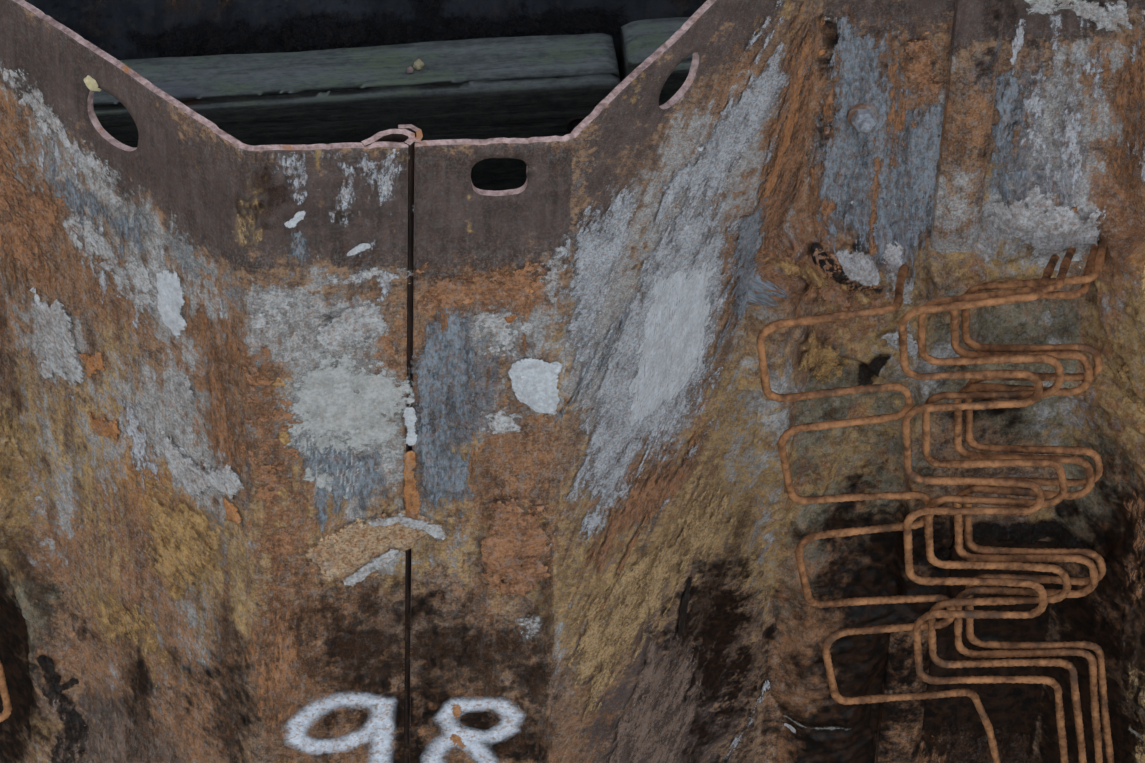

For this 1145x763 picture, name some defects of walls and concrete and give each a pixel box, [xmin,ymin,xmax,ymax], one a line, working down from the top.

rust [0,138,89,302]
rust [747,0,887,315]
rust [868,31,942,268]
spalling [987,71,1106,276]
peeling [30,287,86,405]
peeling [156,270,187,339]
spalling [798,327,891,386]
peeling [161,431,244,499]
rust [182,282,315,743]
peeling [294,432,386,533]
rust [450,734,466,750]
water stain [924,718,1075,763]